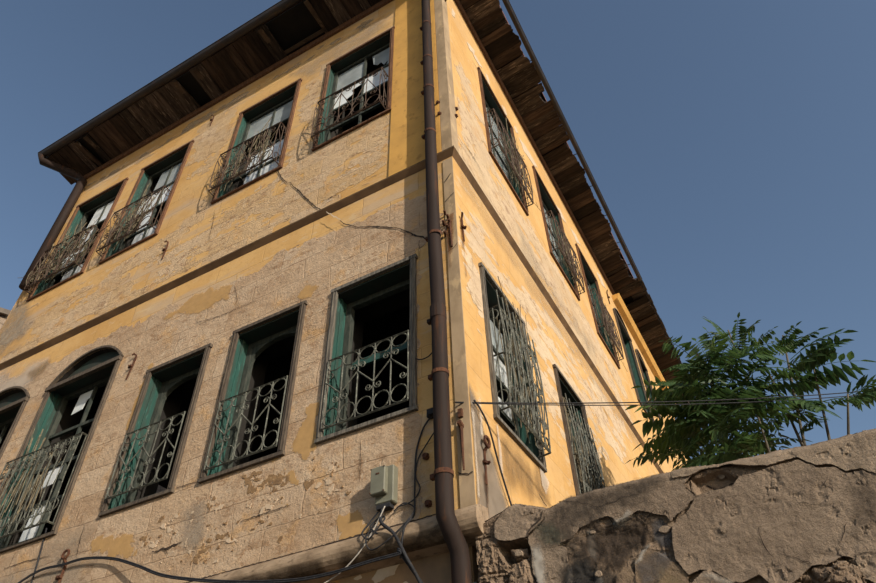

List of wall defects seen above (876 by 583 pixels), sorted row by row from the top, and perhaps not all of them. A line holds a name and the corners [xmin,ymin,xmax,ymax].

peeling [0,73,390,364]
crack [277,170,425,247]
peeling [0,191,427,583]
spalling [481,540,538,583]
spalling [568,514,674,583]
spalling [800,558,870,583]